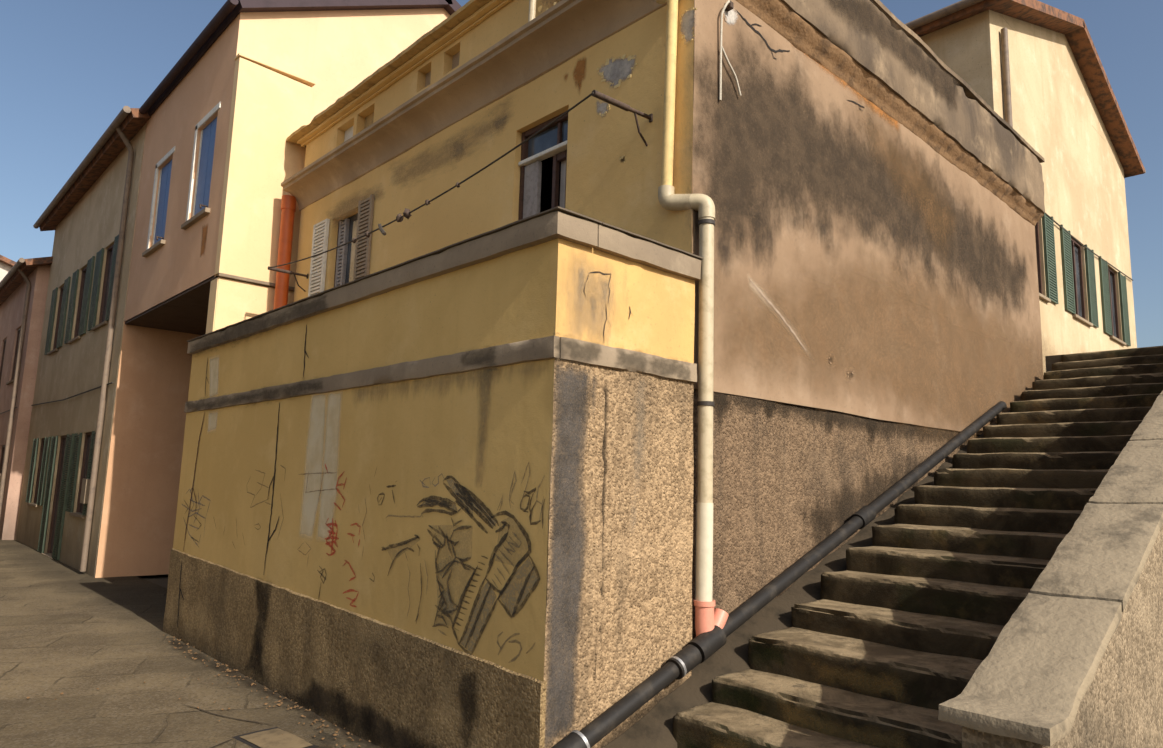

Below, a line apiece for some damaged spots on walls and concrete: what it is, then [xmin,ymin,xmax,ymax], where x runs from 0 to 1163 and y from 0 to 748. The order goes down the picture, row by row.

peeling [597,54,637,88]
peeling [680,7,697,41]
leakage [830,0,957,104]
leakage [694,48,1026,307]
crack [584,271,633,334]
crack [264,403,280,569]
leakage [172,582,425,748]
leakage [460,675,476,742]